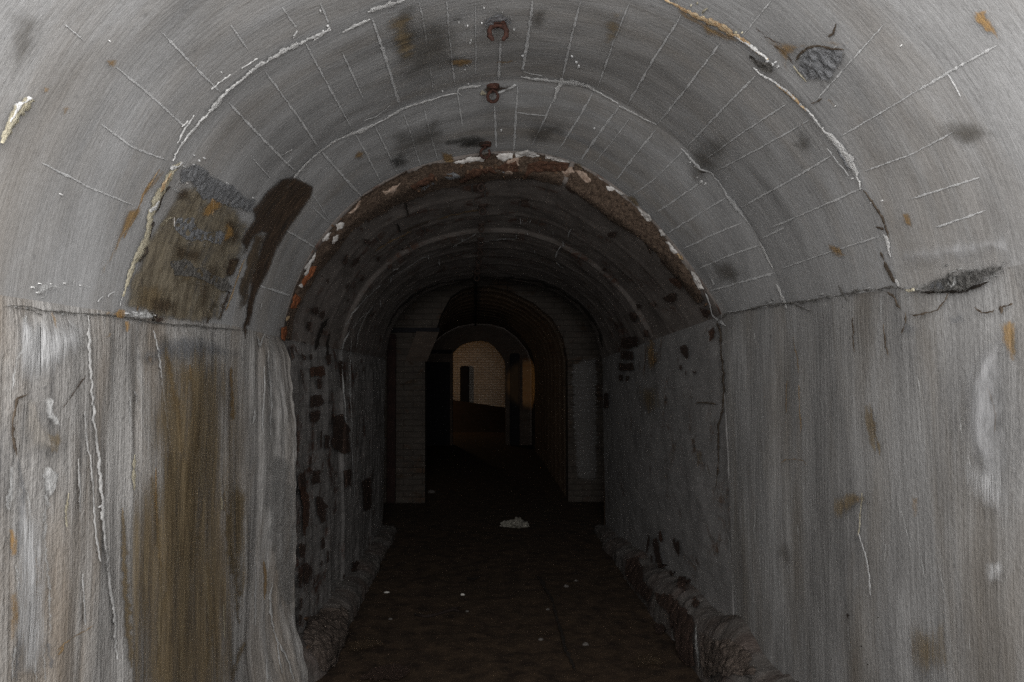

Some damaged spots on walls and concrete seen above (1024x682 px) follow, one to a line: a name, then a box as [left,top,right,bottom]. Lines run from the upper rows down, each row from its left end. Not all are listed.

water stain [120,0,405,305]
water stain [207,64,481,435]
spalling [281,150,726,454]
spalling [793,24,845,82]
crack [697,190,948,490]
spalling [905,264,1001,294]
crack [974,303,1013,314]
water stain [6,313,295,682]